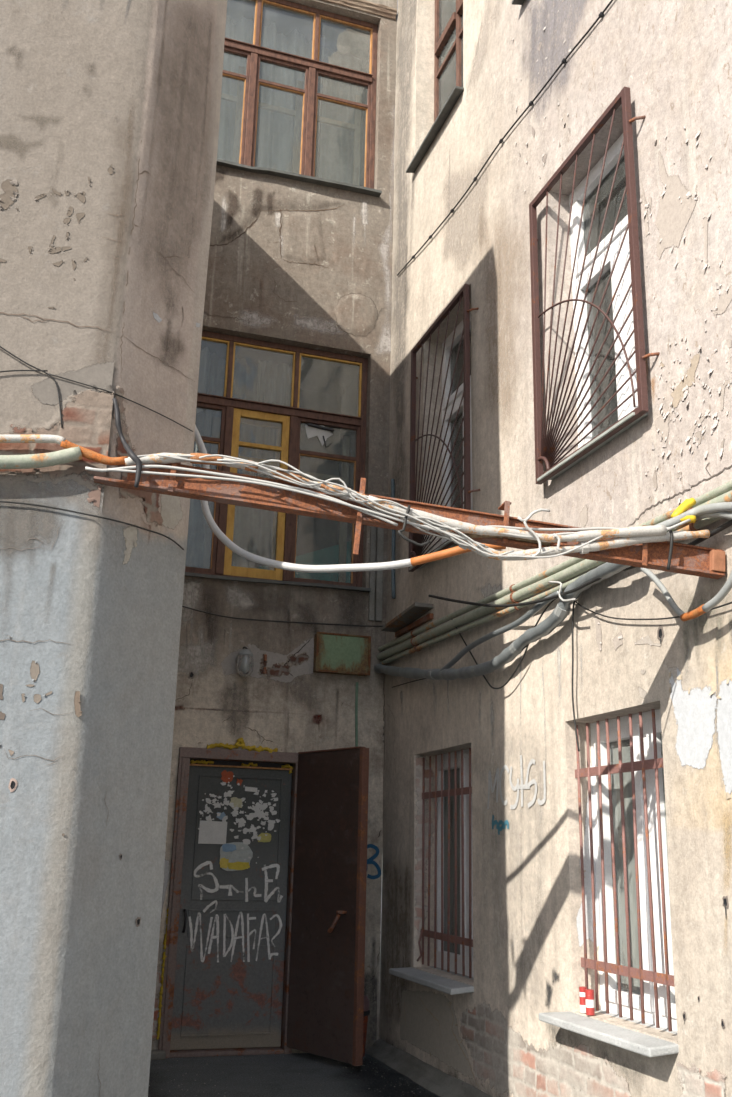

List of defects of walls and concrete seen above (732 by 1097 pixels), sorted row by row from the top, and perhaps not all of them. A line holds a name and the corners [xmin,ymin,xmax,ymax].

peeling [0,179,18,210]
peeling [34,177,91,280]
water stain [221,193,240,238]
water stain [253,190,283,244]
water stain [353,202,368,232]
peeling [638,135,722,269]
flaking render [0,385,163,531]
peeling [645,325,732,511]
flaking render [221,637,314,683]
peeling [668,666,732,799]
flaking render [152,940,162,1045]
flaking render [460,1000,631,1097]